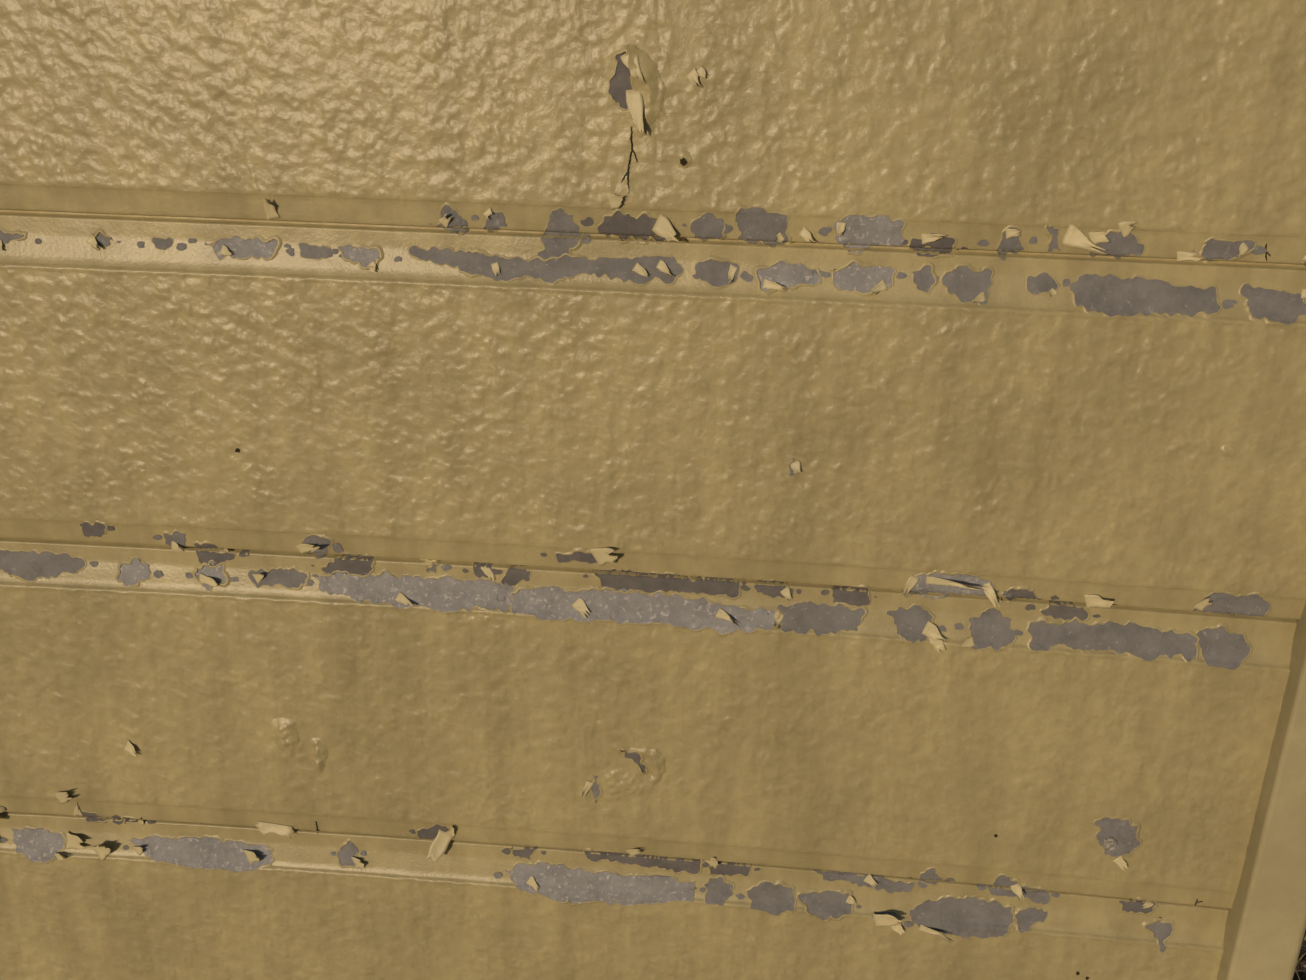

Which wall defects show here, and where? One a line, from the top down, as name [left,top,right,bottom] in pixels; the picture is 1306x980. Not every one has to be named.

peeling [606,46,644,135]
peeling [0,226,41,251]
peeling [86,228,120,251]
peeling [137,193,1306,326]
peeling [0,547,98,583]
peeling [152,529,877,637]
peeling [886,570,1273,671]
peeling [0,792,294,872]
peeling [409,824,455,862]
peeling [1093,816,1143,871]
peeling [493,846,1060,943]
peeling [1118,897,1176,953]